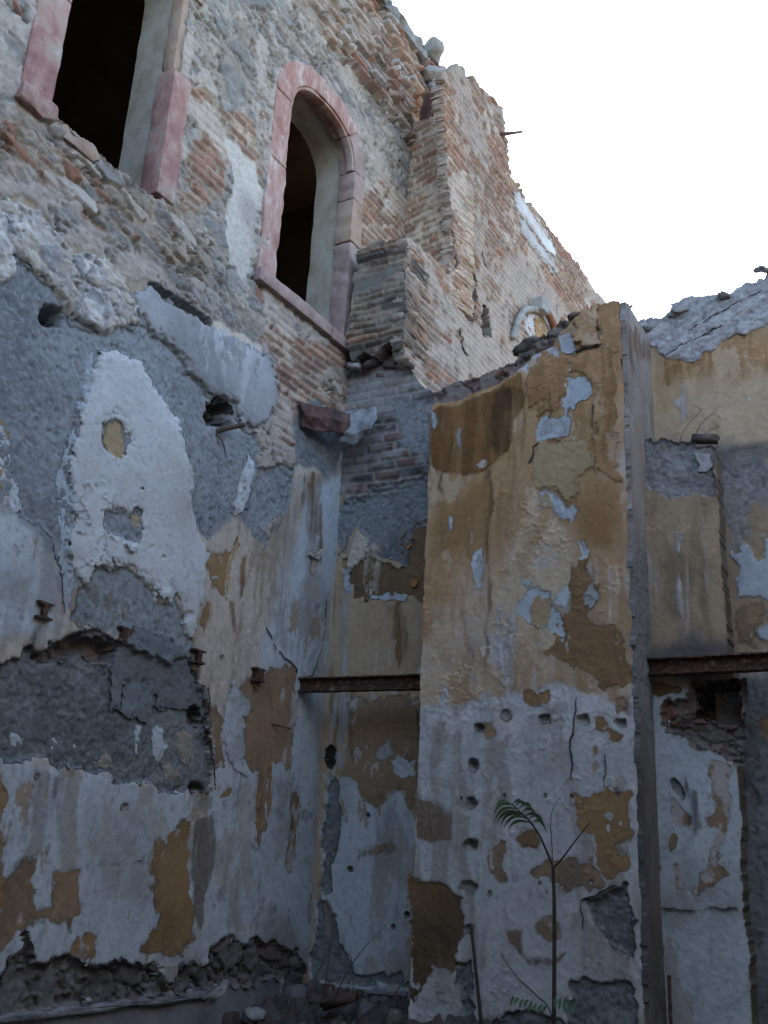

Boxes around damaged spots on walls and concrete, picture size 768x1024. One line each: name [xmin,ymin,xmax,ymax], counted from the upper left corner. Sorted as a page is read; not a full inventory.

spalling [0,195,299,846]
damp [428,373,525,474]
peeling [470,547,484,589]
peeling [523,303,623,523]
peeling [516,541,634,713]
spalling [644,434,720,501]
spalling [0,692,476,1024]
peeling [487,829,540,883]
crack [569,697,577,779]
peeling [529,781,638,958]
peeling [593,716,623,742]
spalling [652,676,768,896]